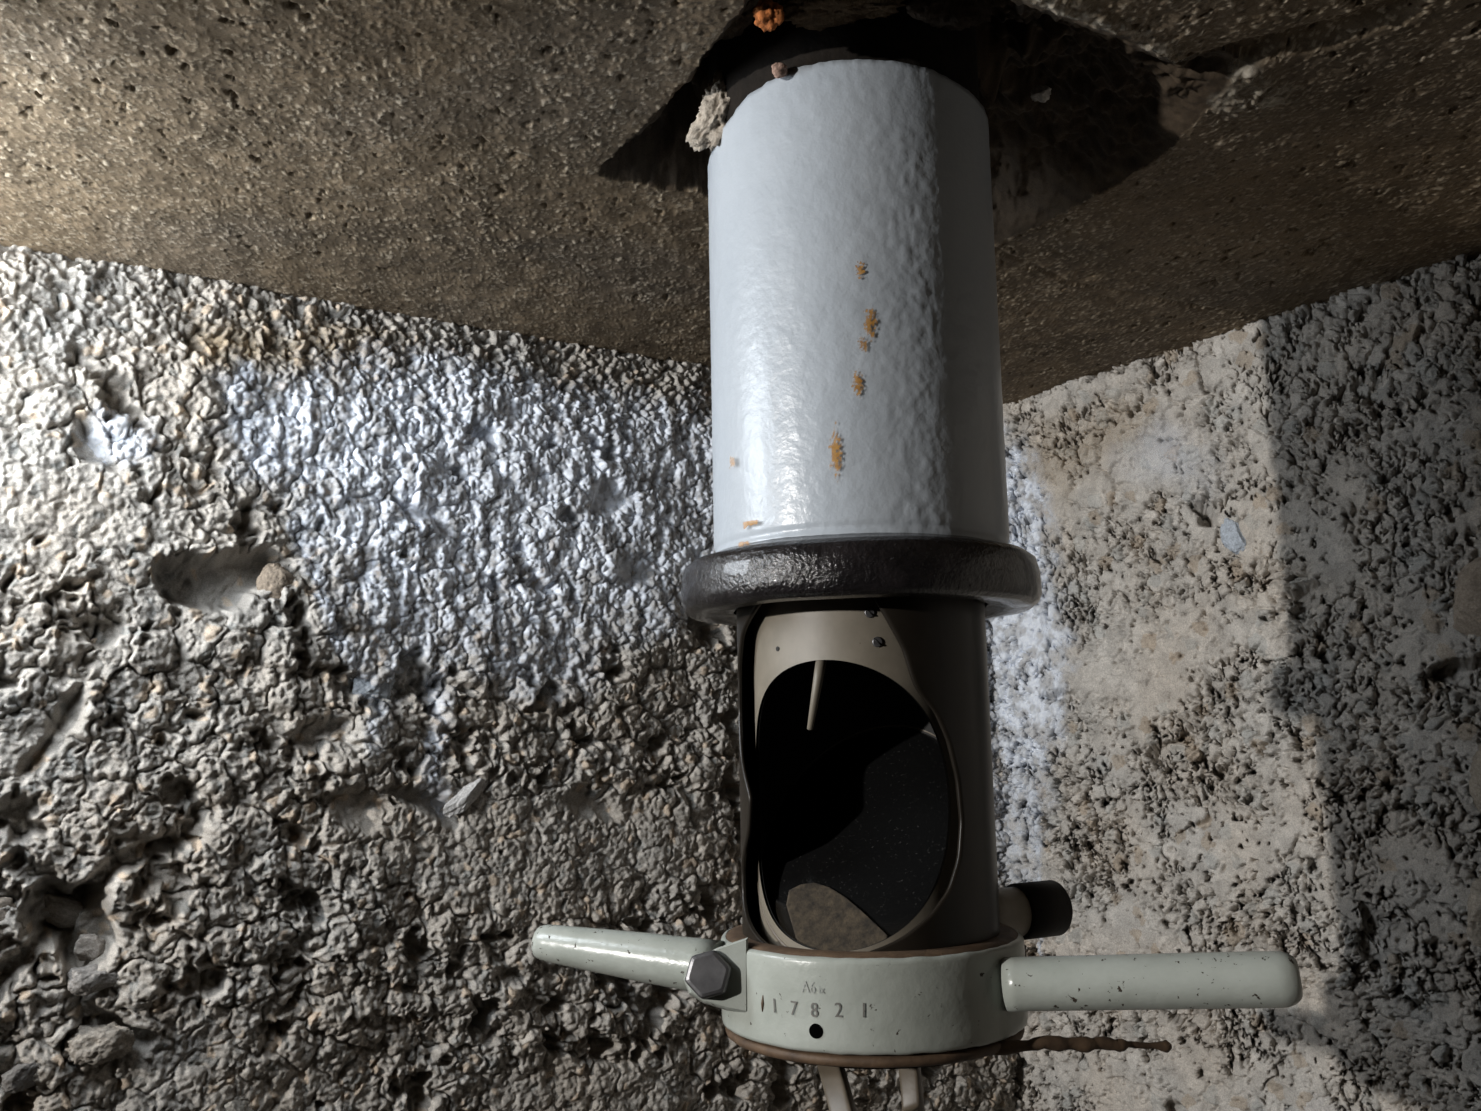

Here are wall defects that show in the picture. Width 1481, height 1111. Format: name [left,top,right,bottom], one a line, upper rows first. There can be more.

spalling [594,0,1241,245]